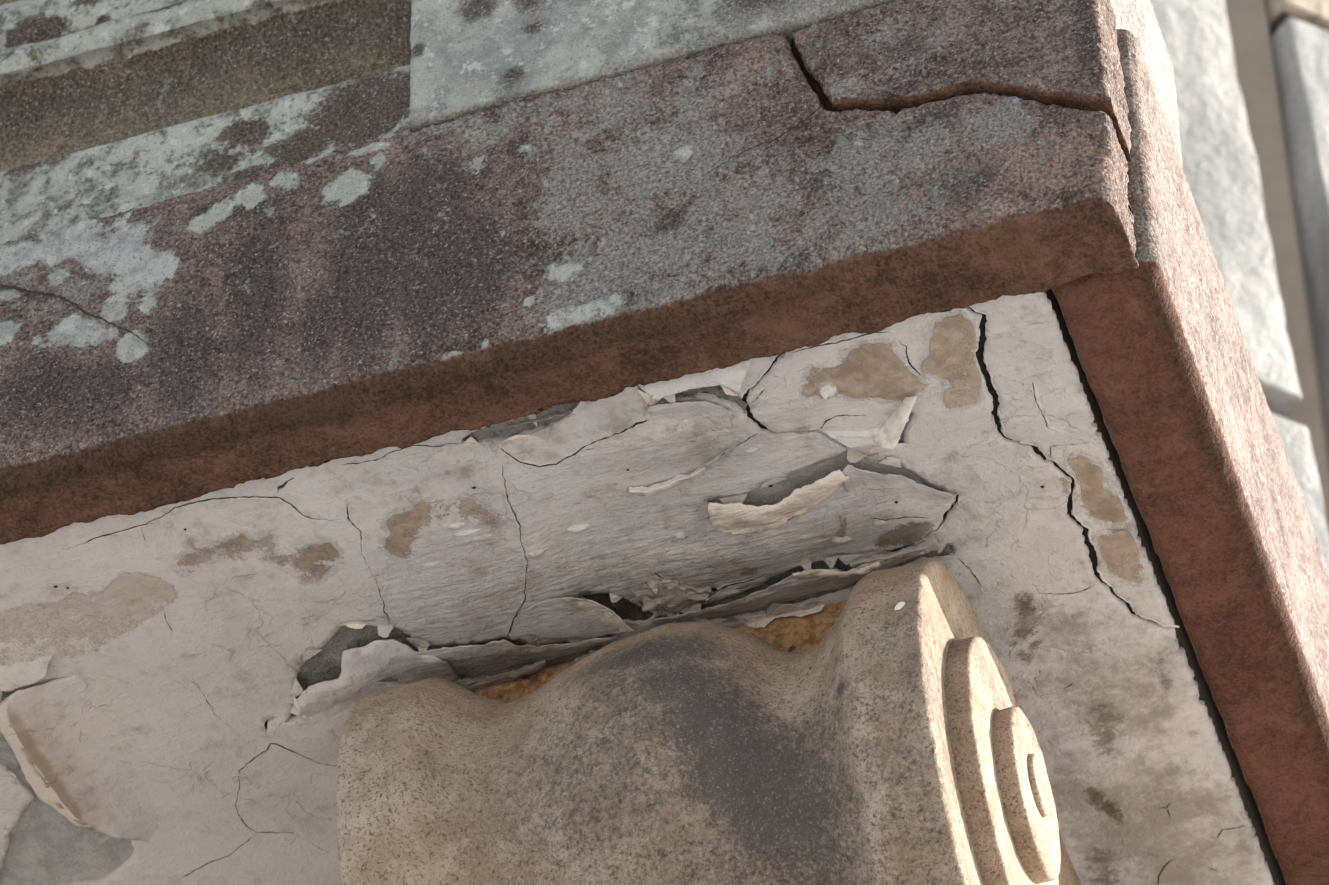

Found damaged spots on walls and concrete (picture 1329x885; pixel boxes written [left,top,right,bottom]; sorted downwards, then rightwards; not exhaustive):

crack [0,284,150,347]
crack [64,478,393,626]
peeling [462,401,587,445]
crack [493,419,648,636]
peeling [613,358,753,497]
crack [720,330,928,456]
peeling [696,396,953,535]
crack [868,494,960,539]
crack [967,306,1179,628]
peeling [290,534,956,727]
peeling [0,655,159,885]
crack [184,676,337,877]